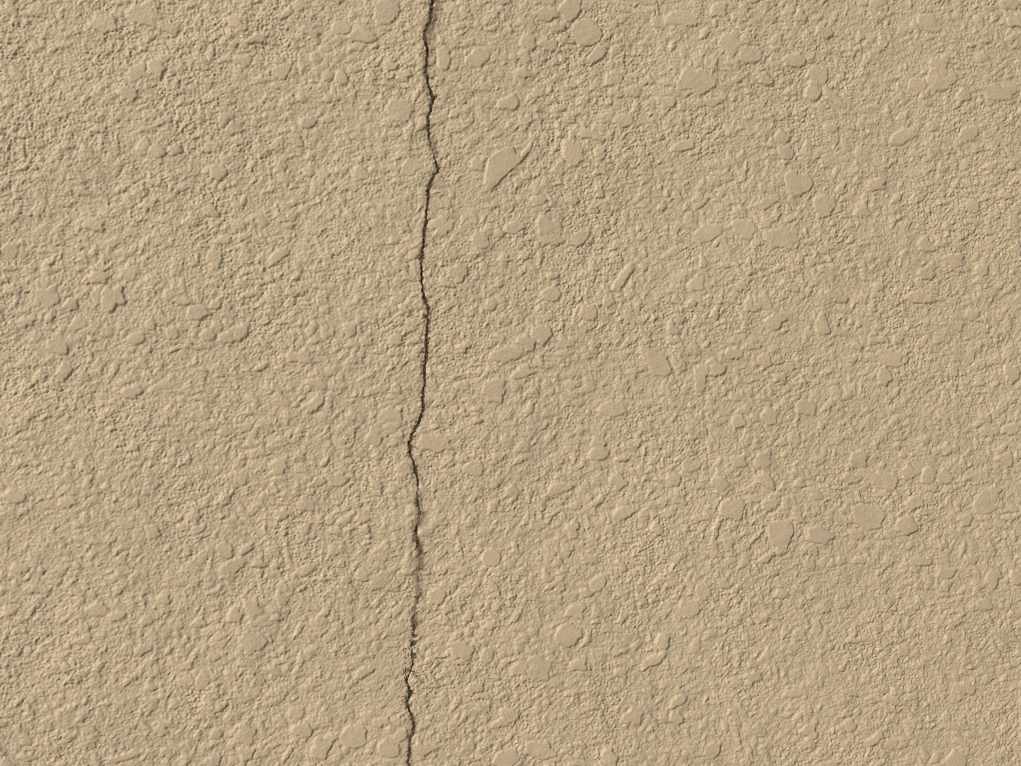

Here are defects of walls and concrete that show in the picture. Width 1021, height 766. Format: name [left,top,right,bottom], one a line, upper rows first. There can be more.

crack [403,0,442,766]